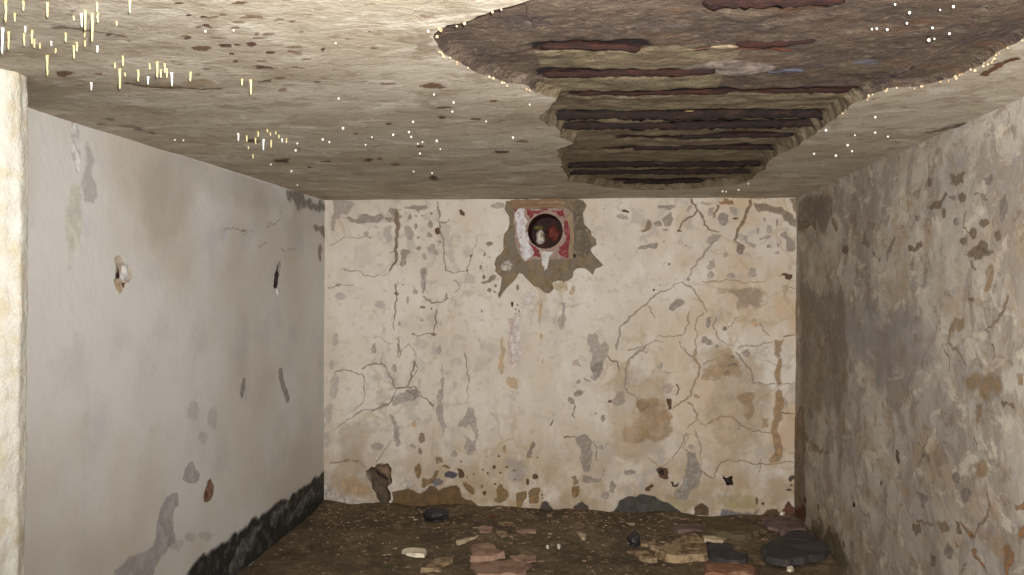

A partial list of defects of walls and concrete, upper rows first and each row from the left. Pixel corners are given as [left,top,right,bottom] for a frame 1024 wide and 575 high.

spalling [400,0,1024,190]
spalling [114,255,132,295]
crack [328,208,477,430]
peeling [486,199,603,327]
crack [606,198,795,478]
crack [331,443,390,469]
flaking render [366,463,392,503]
rust [738,340,823,522]
water stain [808,504,848,570]